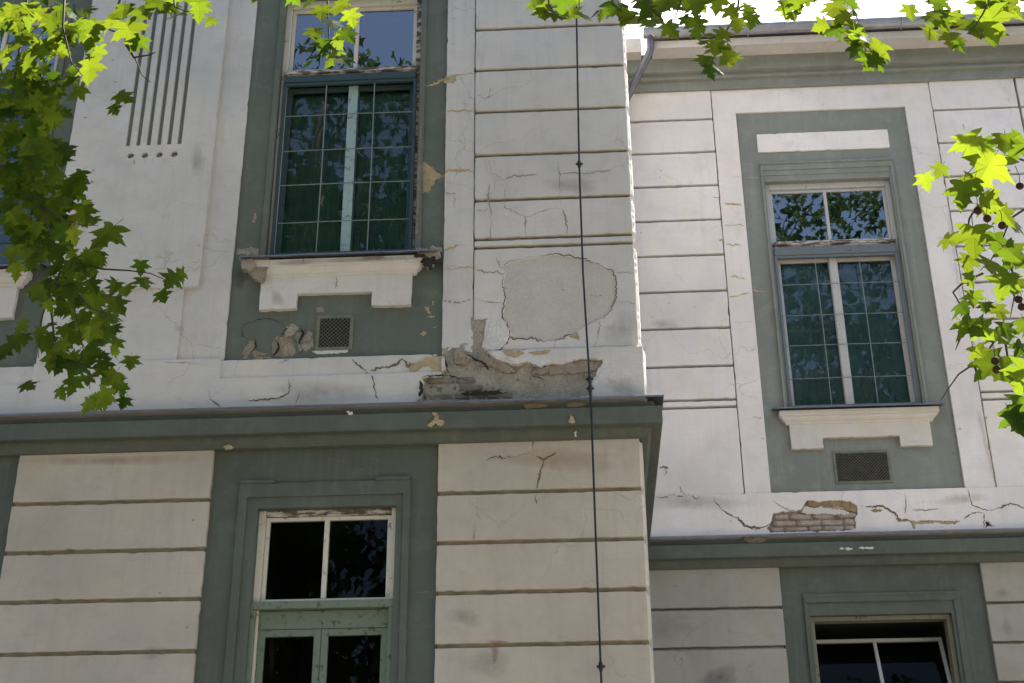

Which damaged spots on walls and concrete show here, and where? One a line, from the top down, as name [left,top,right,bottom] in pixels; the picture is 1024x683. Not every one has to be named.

flaking render [236,247,270,283]
crack [442,165,634,353]
flaking render [242,324,348,360]
crack [248,359,299,402]
crack [352,359,409,398]
flaking render [405,317,602,427]
crack [488,437,556,504]
flaking render [742,500,857,543]
crack [861,495,938,525]
crack [964,491,1024,527]